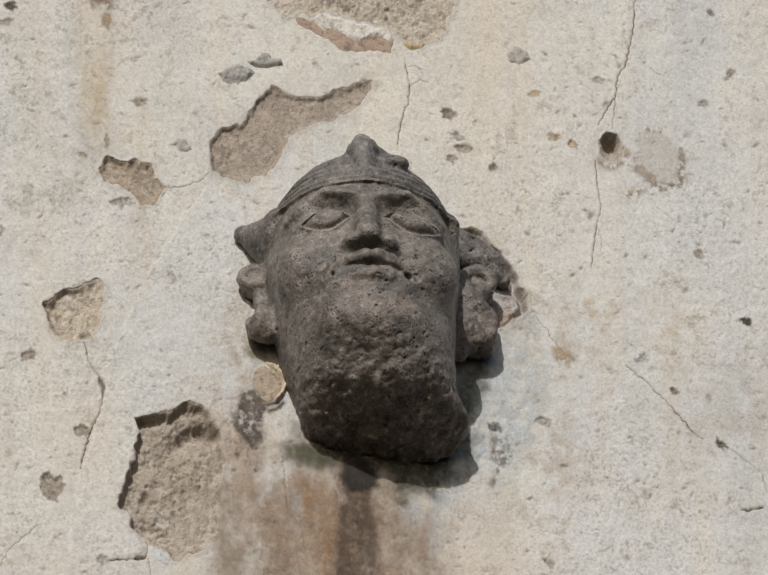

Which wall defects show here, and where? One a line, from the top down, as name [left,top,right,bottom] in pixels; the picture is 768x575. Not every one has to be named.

flaking render [267,0,455,53]
crack [602,12,635,119]
flaking render [99,157,165,208]
flaking render [209,80,373,184]
spalling [599,135,625,162]
flaking render [42,279,104,343]
crack [80,379,105,469]
leakage [488,362,538,458]
flaking render [118,401,226,565]
leakage [255,453,412,575]